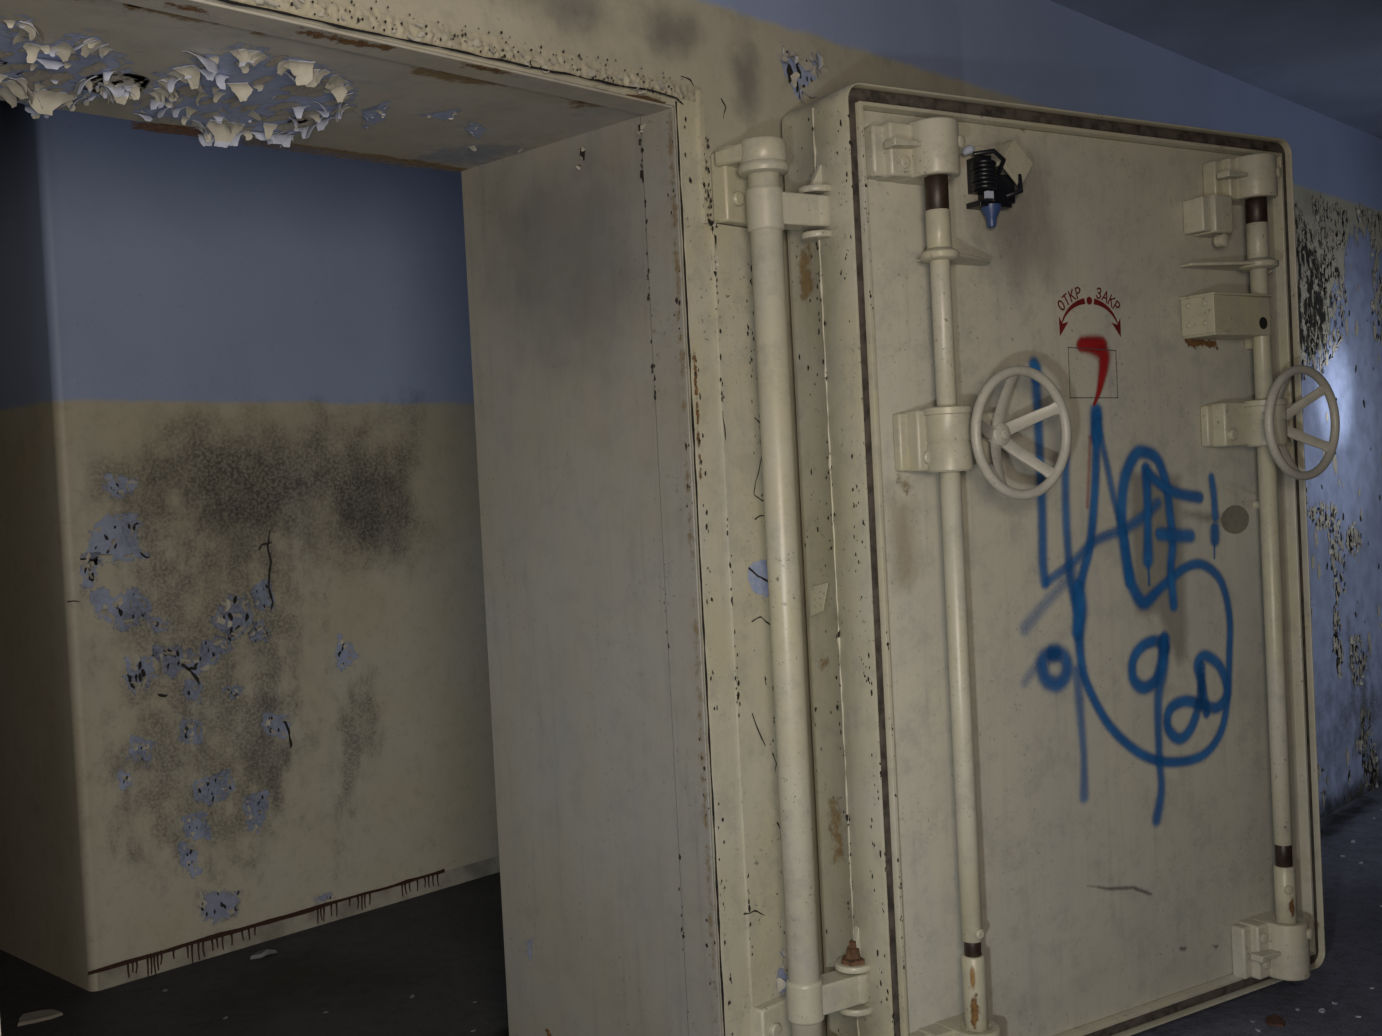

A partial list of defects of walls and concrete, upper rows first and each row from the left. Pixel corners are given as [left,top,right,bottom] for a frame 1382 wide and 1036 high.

peeling [0,15,392,148]
spalling [233,0,703,129]
peeling [637,124,646,182]
peeling [777,45,828,131]
peeling [667,137,719,310]
peeling [796,242,828,396]
leakage [187,442,396,540]
crack [218,0,765,1036]
peeling [1294,192,1382,814]
crack [127,663,200,697]
crack [752,713,777,770]
peeling [177,769,270,924]